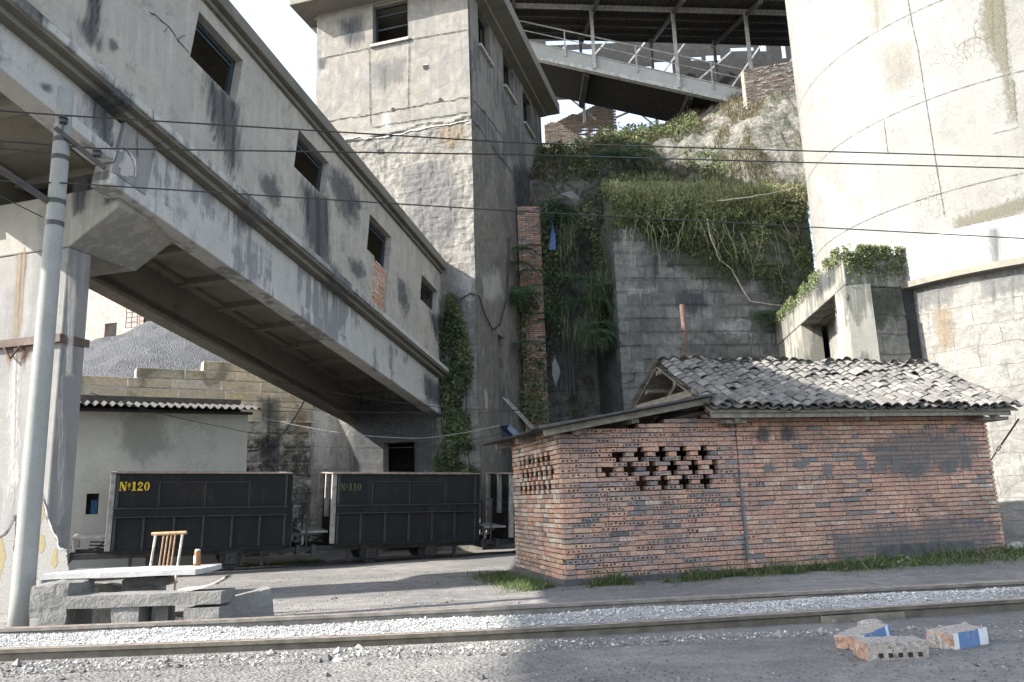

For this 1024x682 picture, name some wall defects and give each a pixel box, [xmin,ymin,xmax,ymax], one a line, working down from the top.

crack [149,11,189,52]
water stain [978,0,1016,119]
water stain [208,78,238,168]
crack [801,0,1024,256]
water stain [262,176,278,201]
water stain [303,169,360,259]
water stain [352,261,365,278]
peeling [0,514,16,613]
peeling [37,499,69,579]